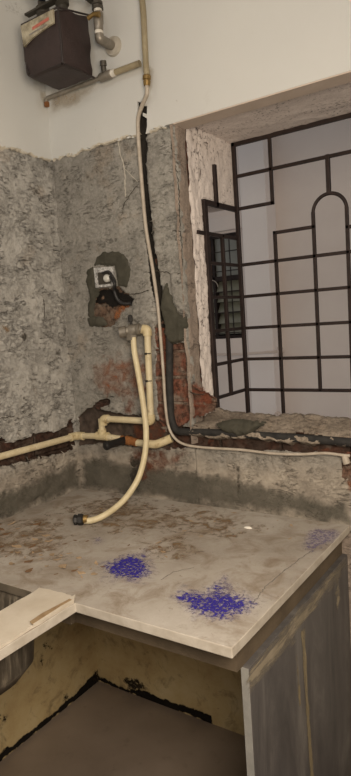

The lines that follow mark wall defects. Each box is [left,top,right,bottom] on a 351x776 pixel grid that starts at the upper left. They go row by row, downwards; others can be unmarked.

flaking render [94,286,134,327]
flaking render [0,321,351,487]
leakage [0,670,212,762]